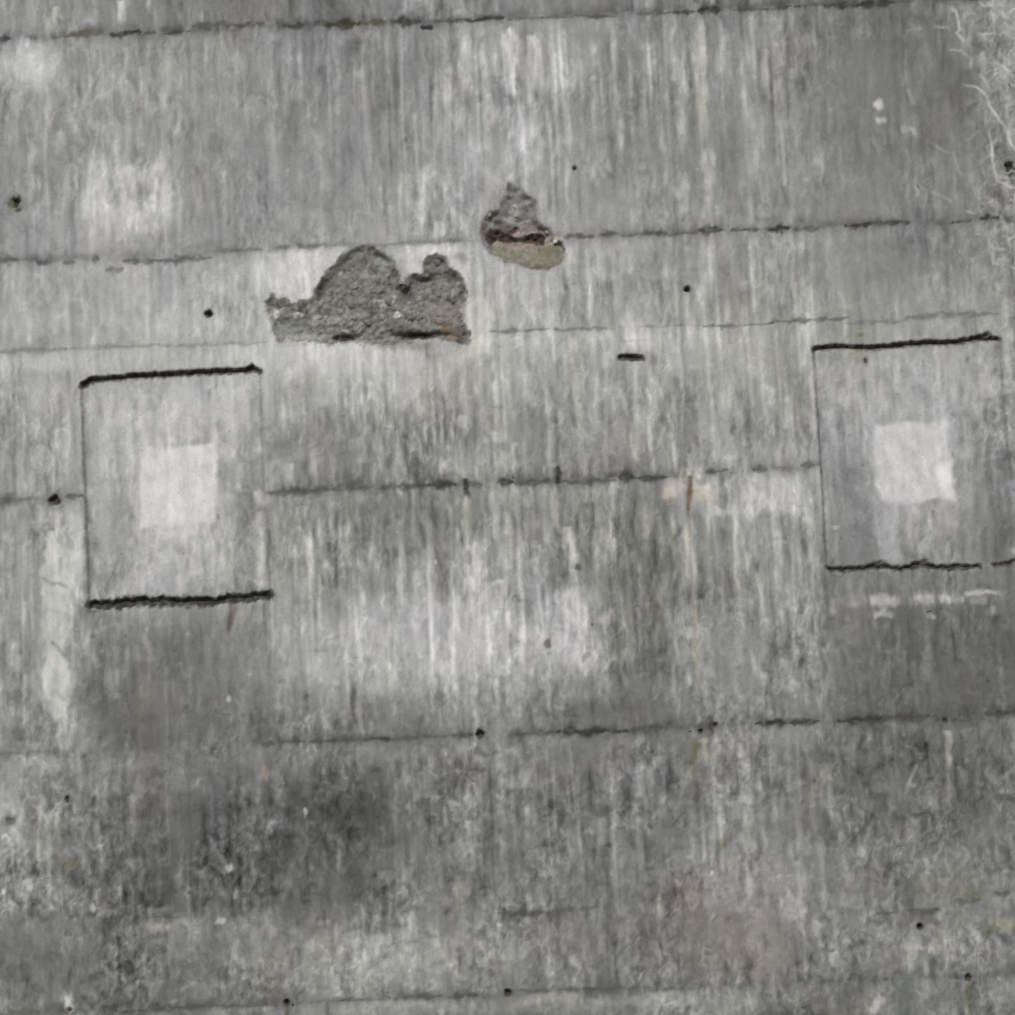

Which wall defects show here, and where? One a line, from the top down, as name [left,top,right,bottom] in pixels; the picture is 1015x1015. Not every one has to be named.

efflorescence [900,0,1015,205]
spalling [474,178,565,276]
spalling [259,237,473,347]
efflorescence [951,327,1015,426]